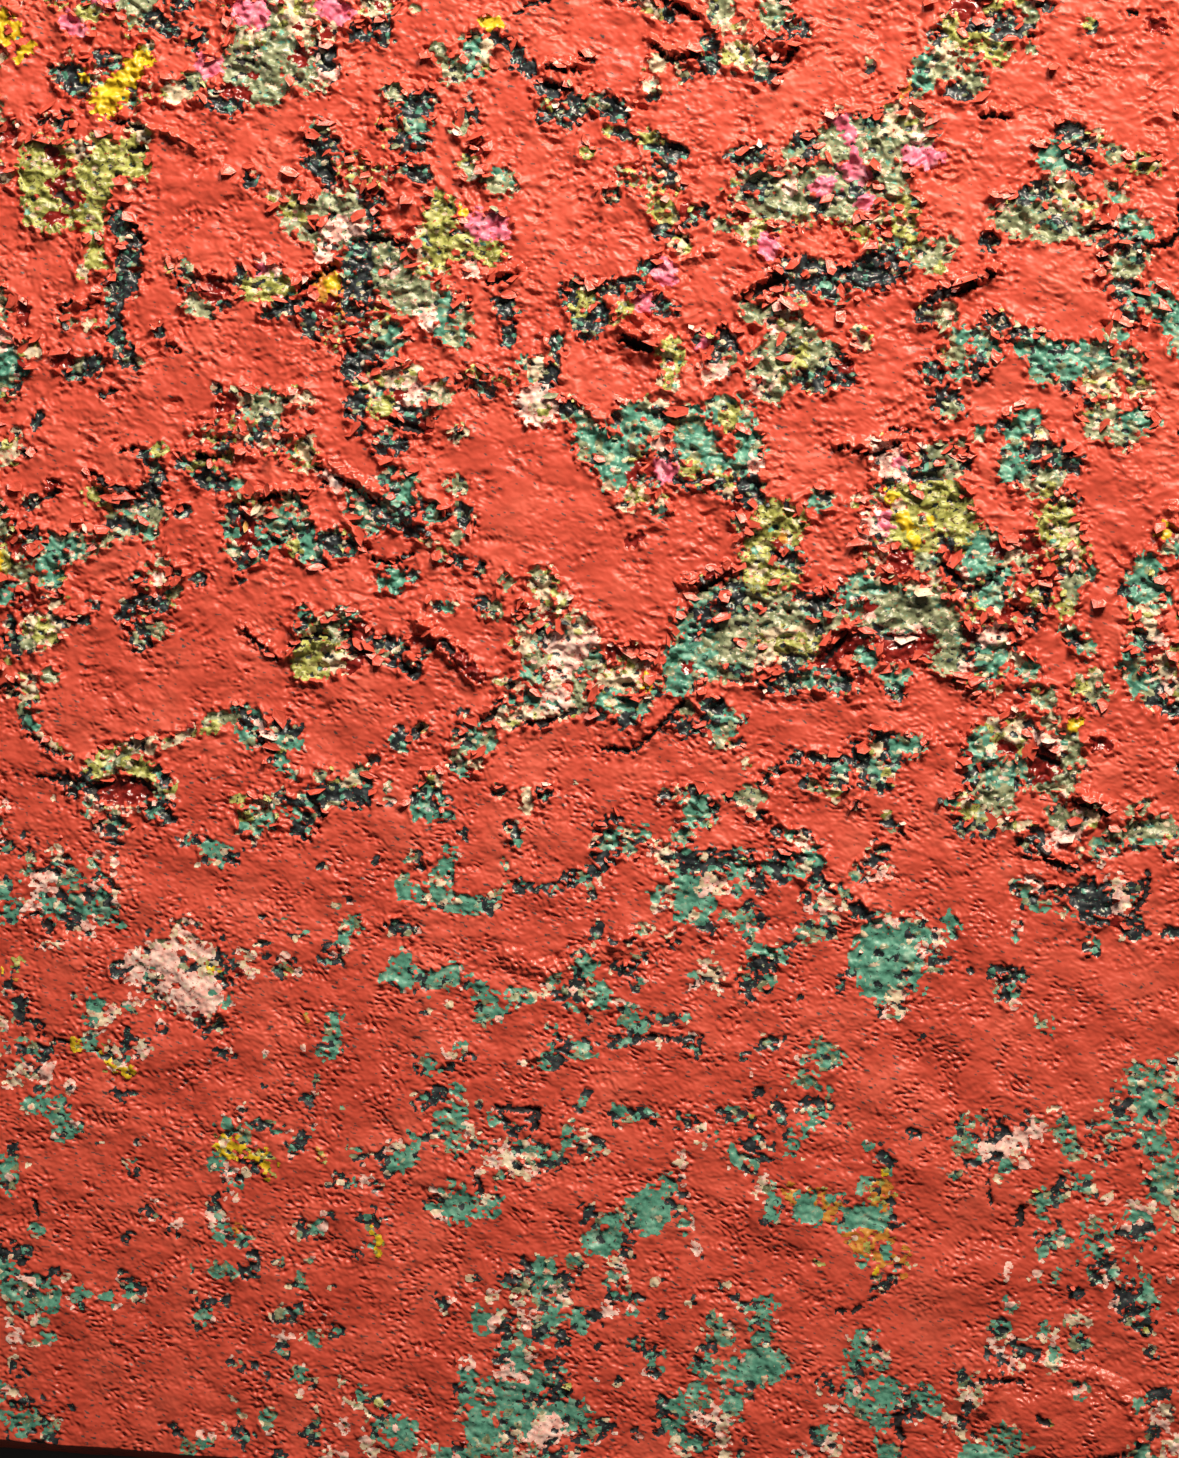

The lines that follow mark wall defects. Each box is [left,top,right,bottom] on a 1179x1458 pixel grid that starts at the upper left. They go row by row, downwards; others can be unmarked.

peeling [0,0,1179,1145]
peeling [0,1142,32,1198]
peeling [121,1138,142,1178]
peeling [121,1197,184,1243]
peeling [189,1011,1179,1458]
peeling [0,1199,148,1445]
peeling [167,1394,289,1458]